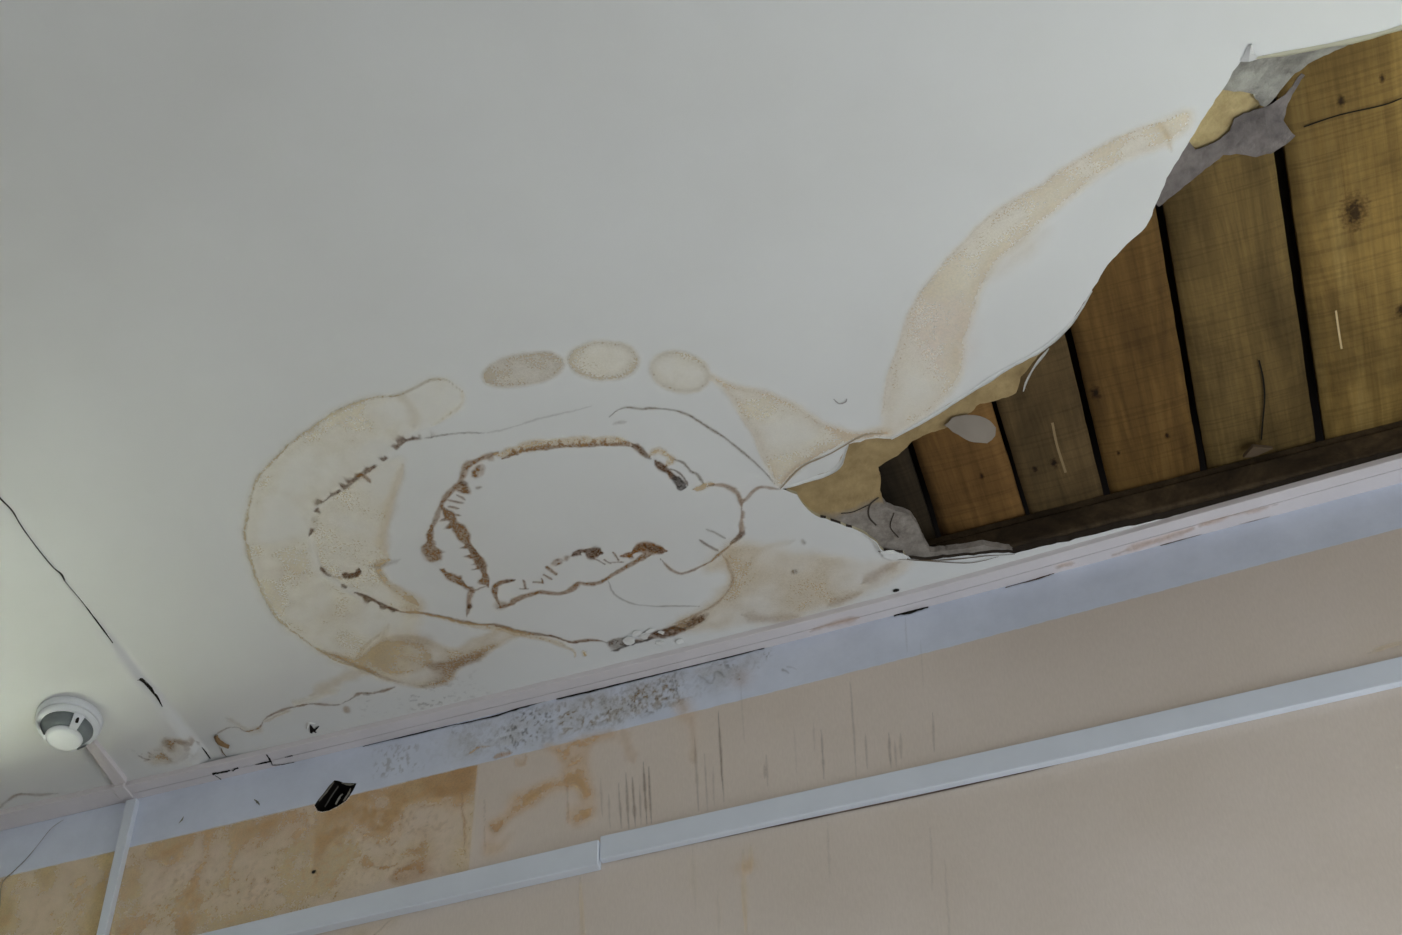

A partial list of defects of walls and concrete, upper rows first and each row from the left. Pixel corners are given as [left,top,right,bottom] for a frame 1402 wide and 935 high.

flaking render [788,353,1041,557]
crack [0,497,113,643]
water stain [315,407,853,656]
crack [139,678,163,707]
water stain [316,641,494,700]
water stain [76,852,243,935]
water stain [148,747,478,902]